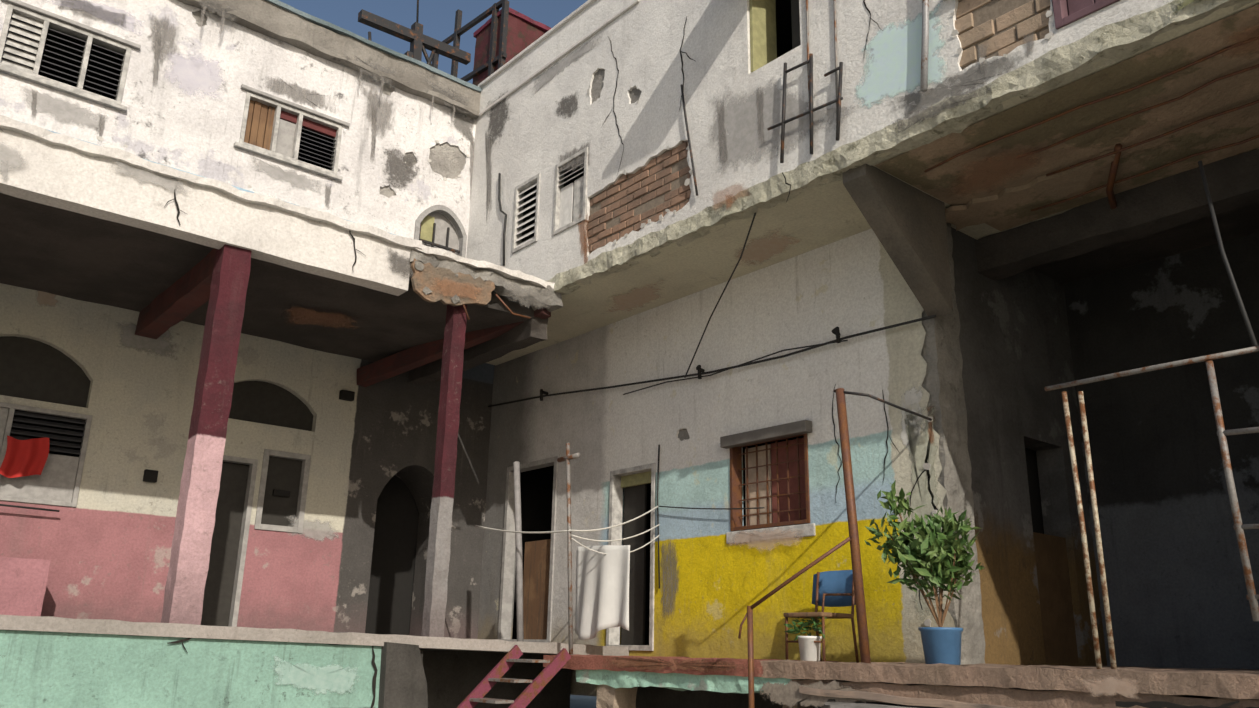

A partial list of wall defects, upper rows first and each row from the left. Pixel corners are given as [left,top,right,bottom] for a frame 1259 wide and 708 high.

crack [603,37,624,175]
crack [679,17,695,110]
crack [164,180,185,225]
spalling [379,185,396,198]
flaking render [587,141,693,255]
spalling [411,258,531,320]
crack [832,384,842,500]
crack [882,390,938,517]